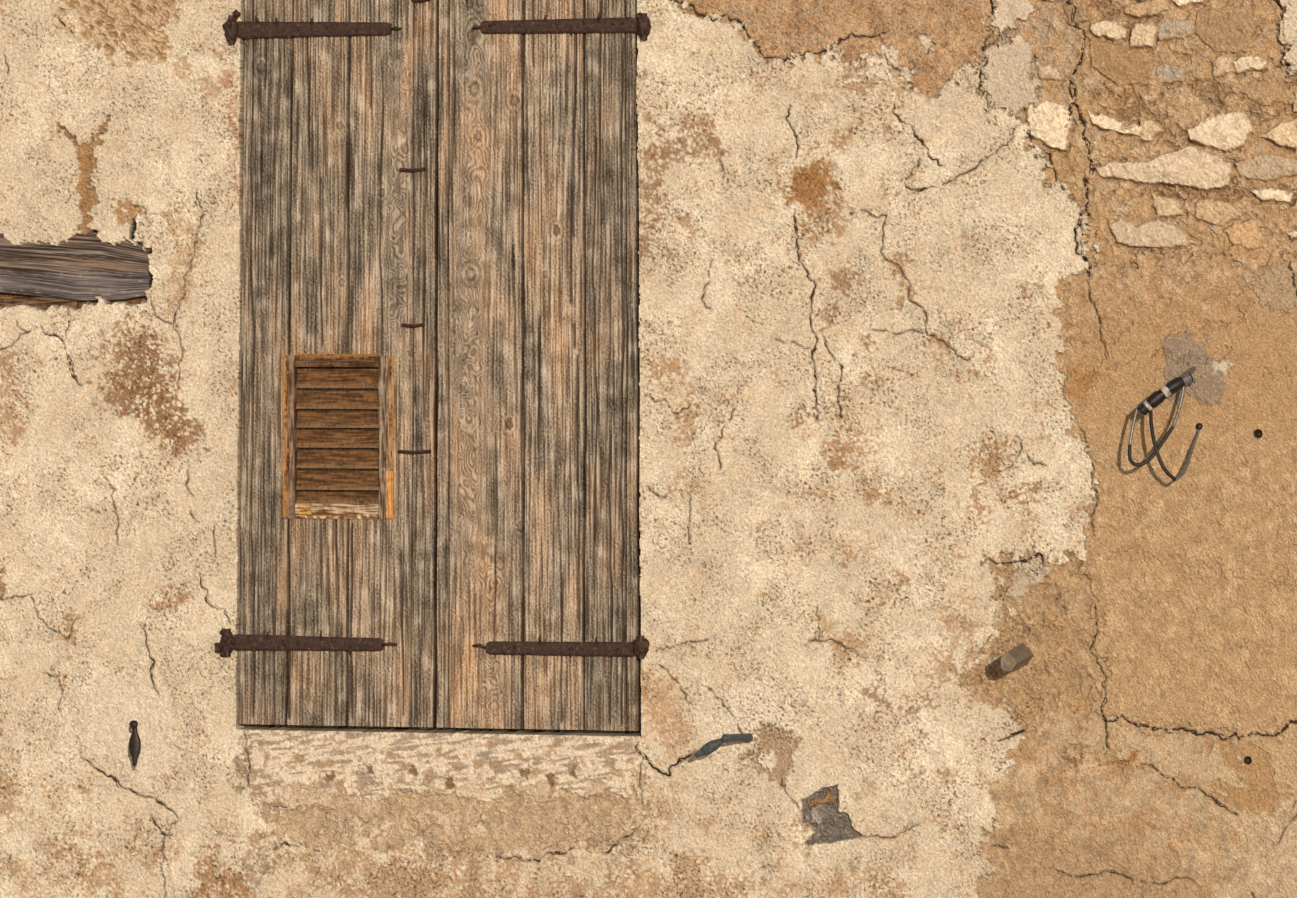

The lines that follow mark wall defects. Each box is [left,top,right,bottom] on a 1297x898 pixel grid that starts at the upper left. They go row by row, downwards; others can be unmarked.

flaking render [56,0,179,67]
crack [671,0,898,70]
flaking render [677,0,1297,267]
crack [892,0,1106,357]
crack [775,215,843,422]
crack [850,210,968,361]
crack [185,470,230,623]
crack [990,553,1044,565]
crack [143,625,158,693]
crack [1056,598,1297,755]
crack [80,757,179,896]
spalling [802,786,860,844]